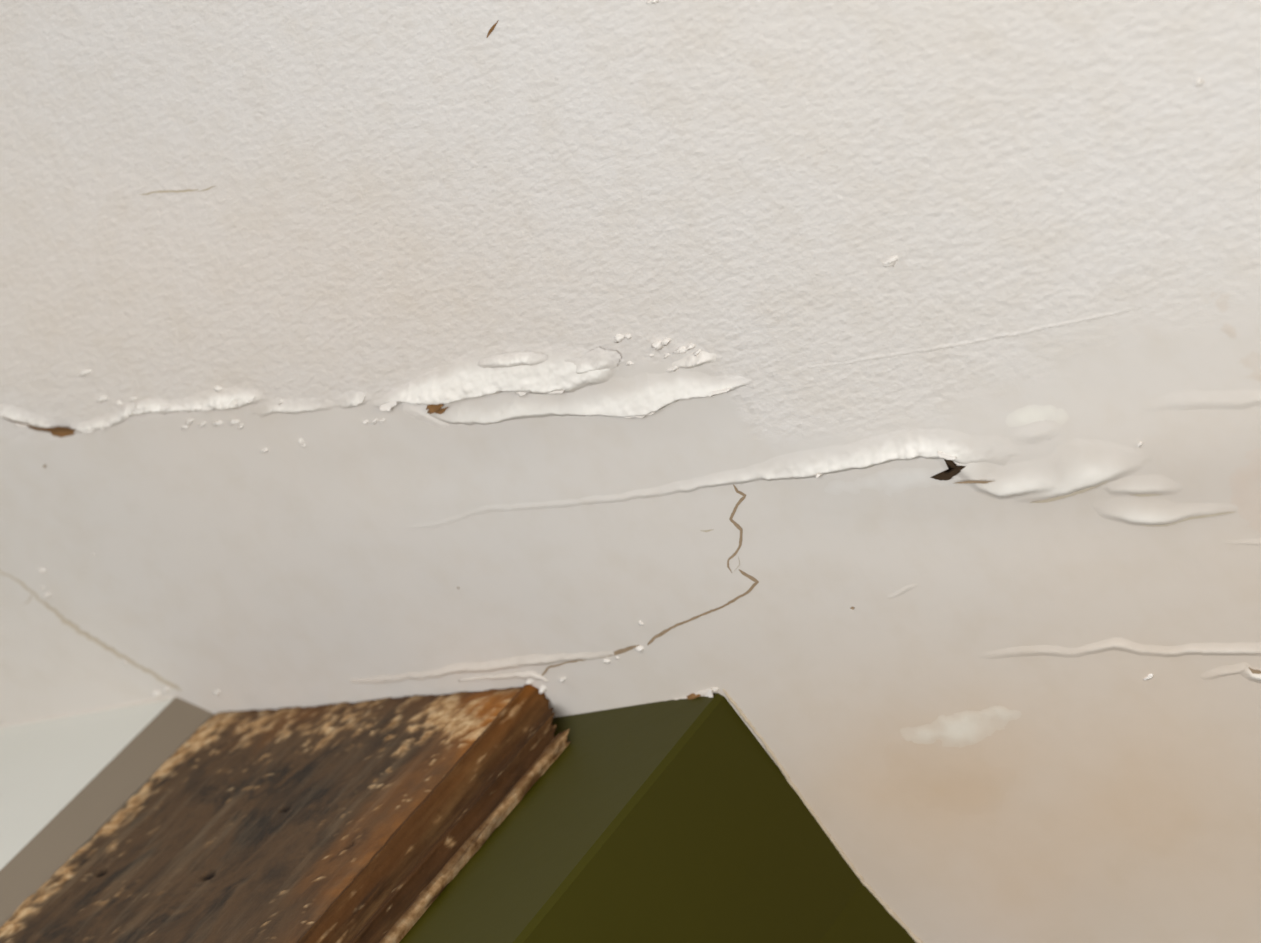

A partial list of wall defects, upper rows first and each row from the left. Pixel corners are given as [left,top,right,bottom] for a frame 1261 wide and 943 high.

peeling [649,338,717,372]
peeling [0,386,374,437]
peeling [396,428,1239,530]
crack [541,484,759,676]